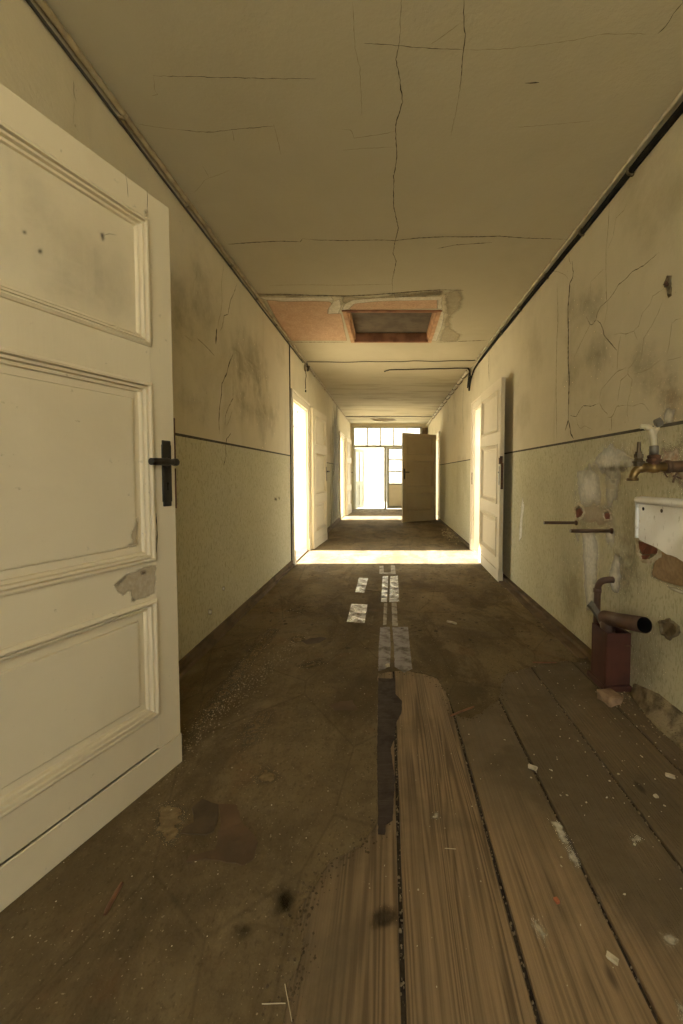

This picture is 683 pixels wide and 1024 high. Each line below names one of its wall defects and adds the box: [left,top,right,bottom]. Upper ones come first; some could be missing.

crack [153,75,308,96]
crack [266,5,681,296]
flaking render [267,300,437,341]
crack [187,239,365,463]
crack [553,253,677,439]
leakage [579,449,631,504]
peeling [115,566,155,601]
leakage [610,558,620,591]
flaking render [635,538,683,587]